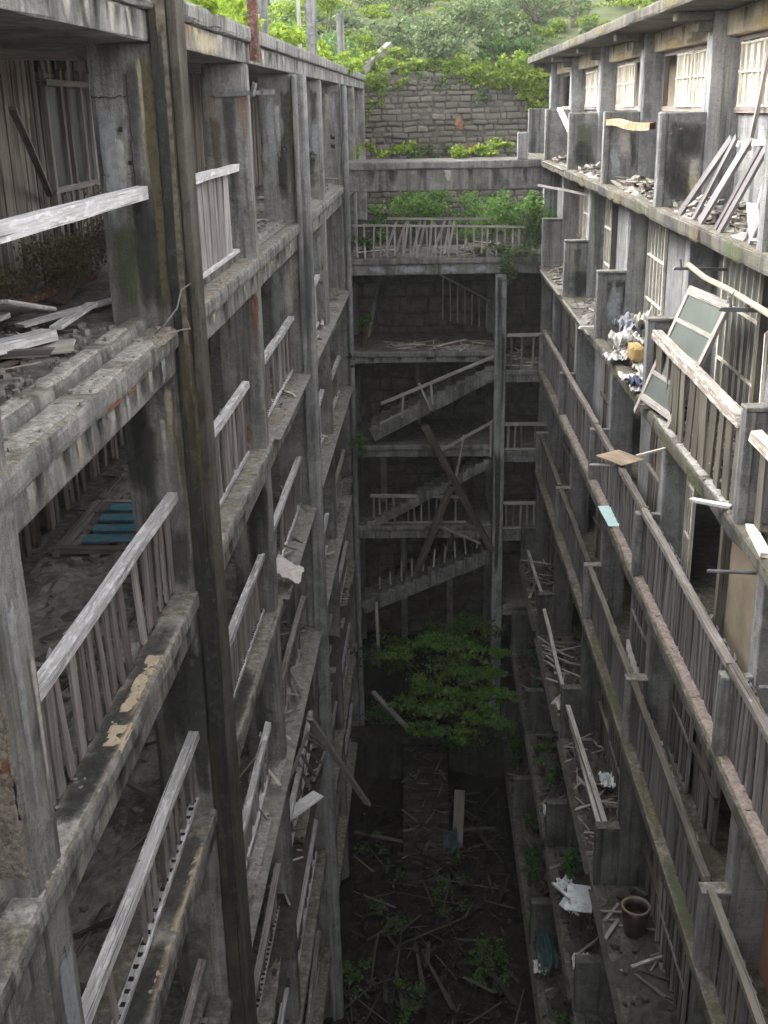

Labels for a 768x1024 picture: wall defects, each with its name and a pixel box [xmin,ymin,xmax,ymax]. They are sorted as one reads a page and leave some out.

water stain [26,27,252,924]
peeling [103,655,163,753]
water stain [123,946,164,1024]